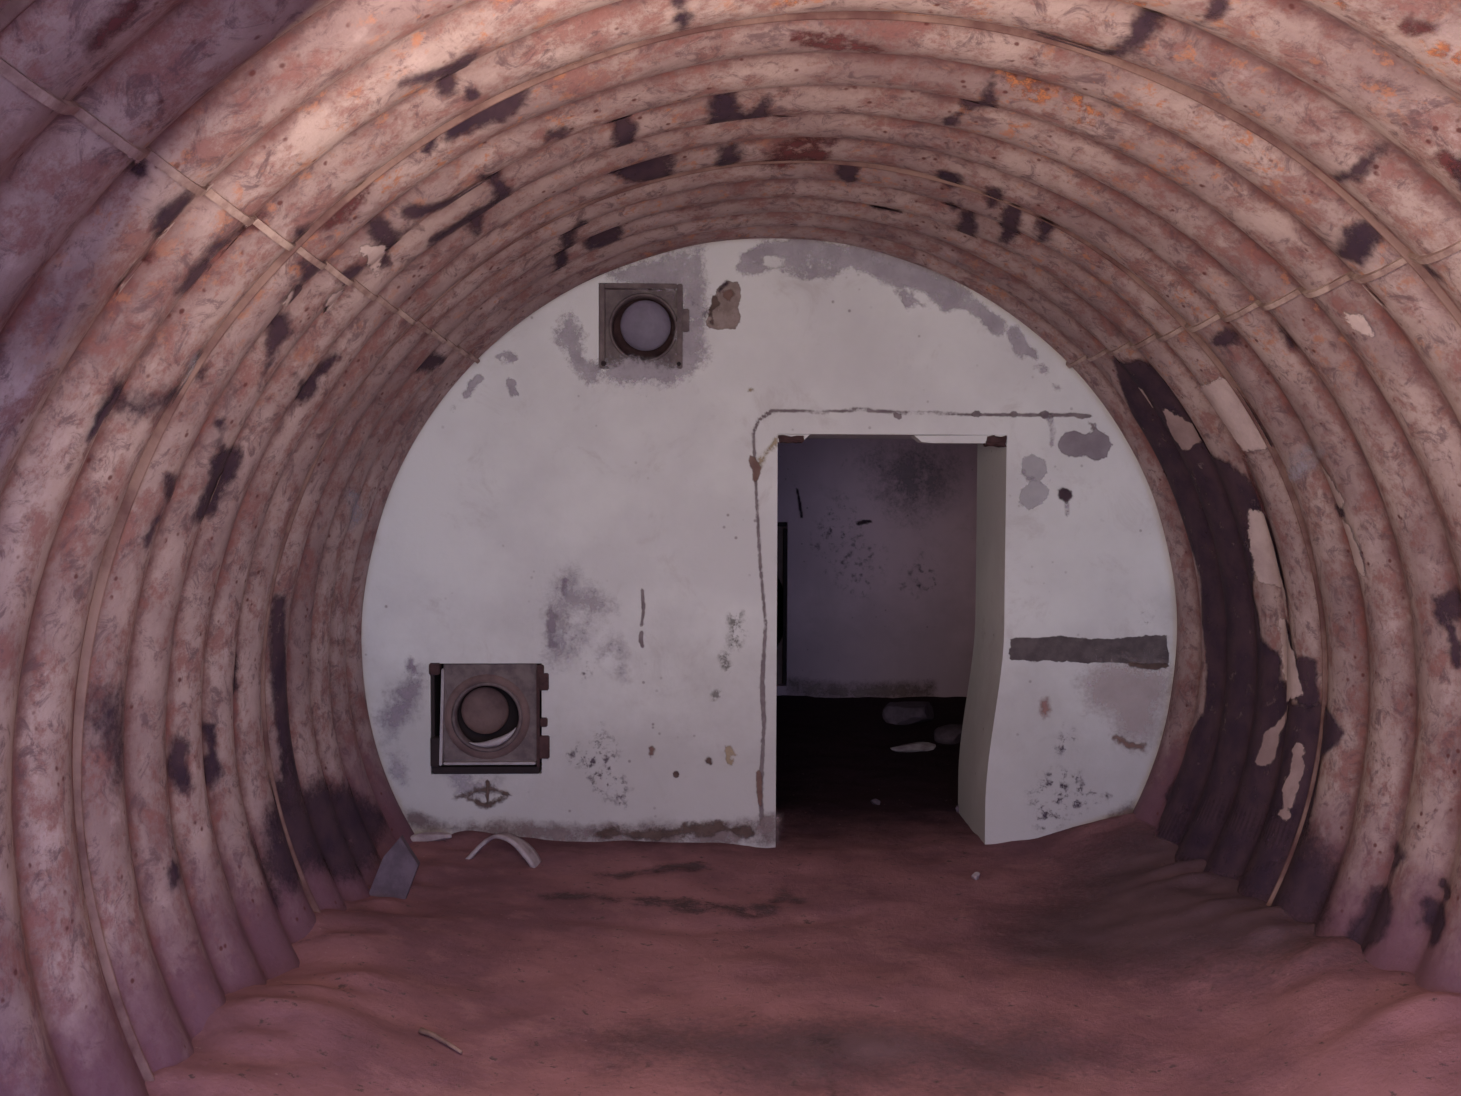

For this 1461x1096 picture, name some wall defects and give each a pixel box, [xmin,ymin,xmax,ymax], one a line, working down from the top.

rust [792,32,879,54]
peeling [1204,0,1228,19]
rust [1426,43,1461,64]
peeling [398,53,528,153]
rust [1006,72,1101,124]
rust [764,137,834,169]
flaking render [555,239,1047,384]
peeling [195,419,243,522]
flaking render [1058,423,1113,461]
peeling [1289,449,1365,576]
leakage [547,578,603,656]
peeling [1113,356,1344,878]